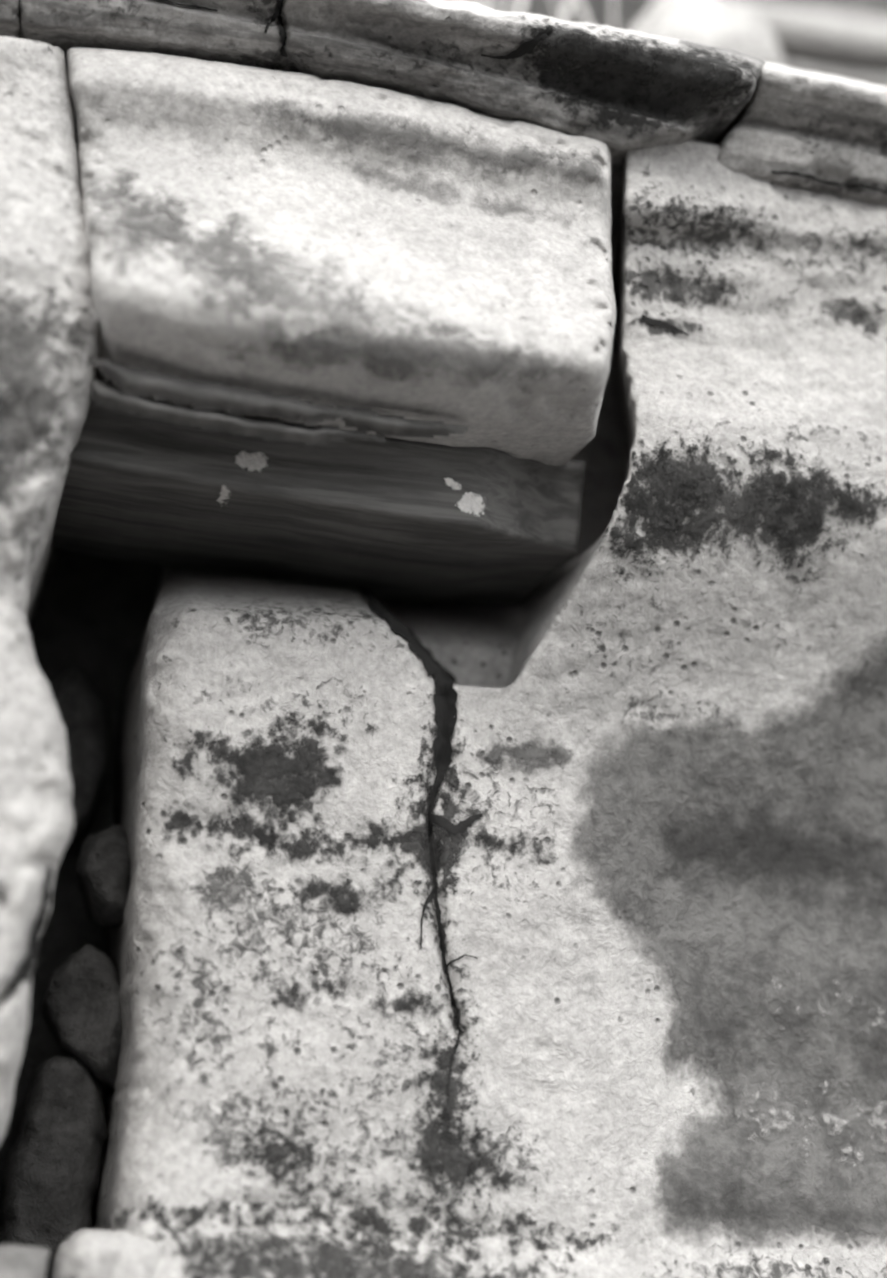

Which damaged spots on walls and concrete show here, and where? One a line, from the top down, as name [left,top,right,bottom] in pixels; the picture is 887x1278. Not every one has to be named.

crack [264,0,288,57]
crack [772,170,887,194]
leakage [597,435,887,593]
leakage [163,700,376,839]
crack [360,590,483,1101]
leakage [389,763,496,918]
leakage [478,740,572,773]
leakage [357,988,459,1023]
leakage [575,649,887,1242]
leakage [242,1036,537,1232]